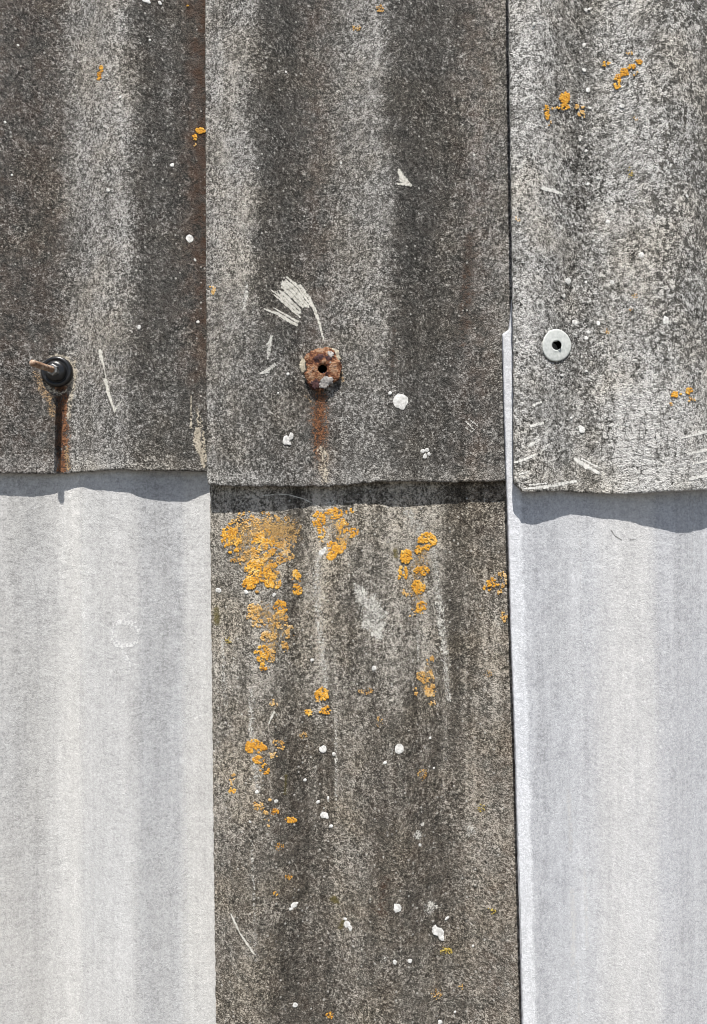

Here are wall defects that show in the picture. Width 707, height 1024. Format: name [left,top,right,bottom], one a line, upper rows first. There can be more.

rust [33,353,78,473]
rust [306,389,331,483]